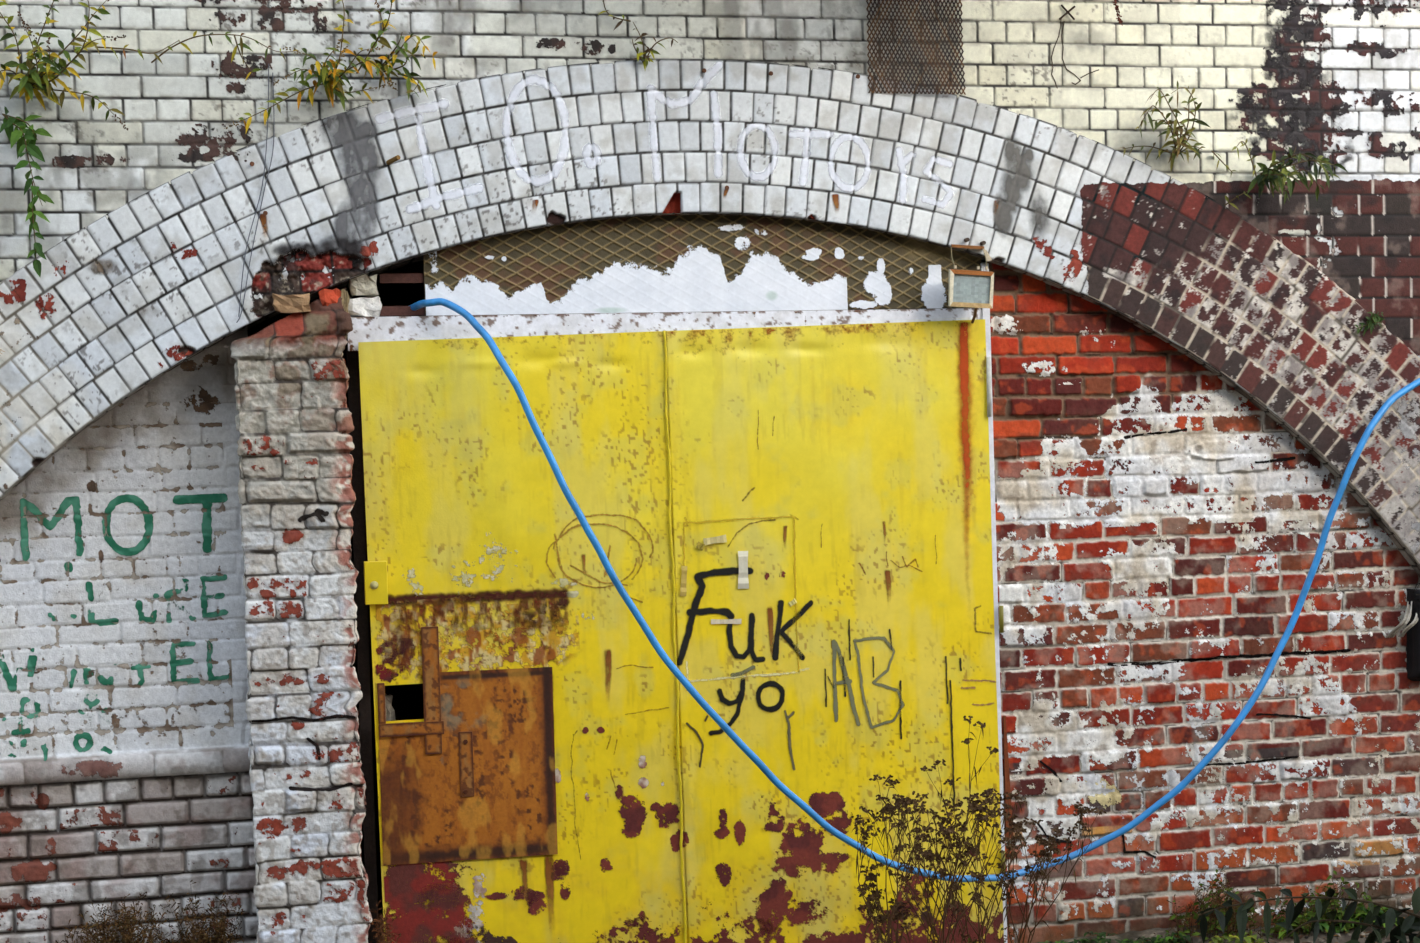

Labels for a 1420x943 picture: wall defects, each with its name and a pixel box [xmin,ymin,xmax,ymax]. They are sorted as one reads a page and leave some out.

spalling [0,279,57,348]
spalling [250,241,379,317]
peeling [425,224,892,316]
peeling [909,265,947,309]
corrosion [958,322,971,521]
flaking render [996,0,1420,924]
peeling [0,345,234,778]
spalling [247,577,355,652]
corrosion [376,588,579,754]
corrosion [459,732,474,797]
peeling [615,756,689,852]
peeling [0,788,159,943]